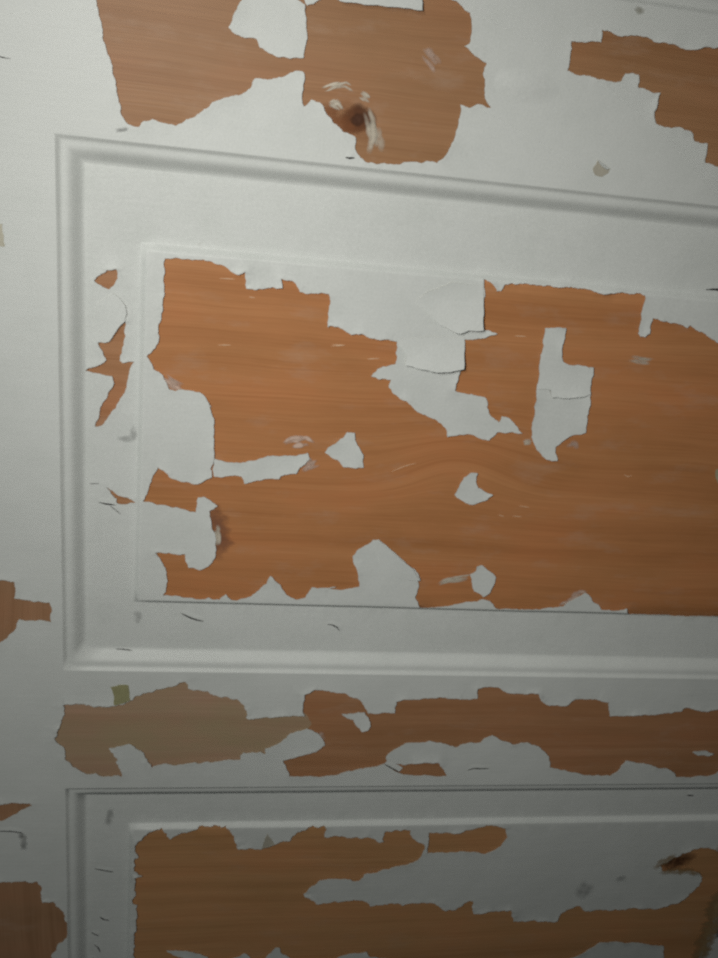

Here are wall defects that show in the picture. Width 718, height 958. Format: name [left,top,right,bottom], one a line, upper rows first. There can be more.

peeling [96,0,490,164]
peeling [567,30,718,167]
peeling [593,160,611,177]
peeling [86,269,133,427]
peeling [108,258,718,616]
peeling [0,580,52,642]
peeling [55,682,718,777]
peeling [0,803,32,821]
peeling [0,881,67,958]
peeling [132,825,718,958]